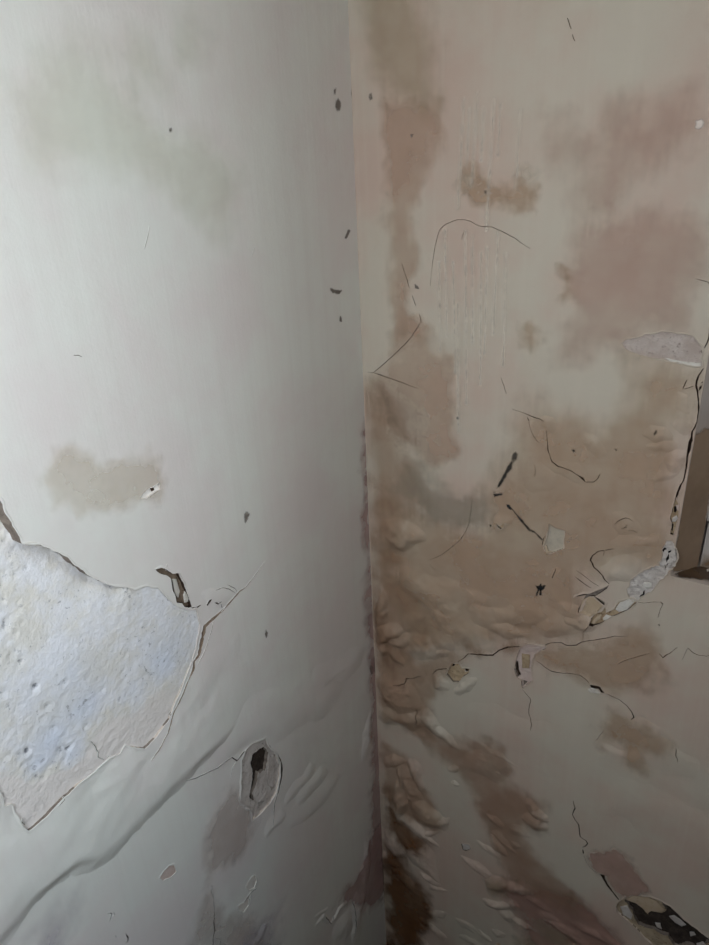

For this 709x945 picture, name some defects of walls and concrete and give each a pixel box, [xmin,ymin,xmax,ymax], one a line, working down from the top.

water stain [494,452,517,497]
water stain [674,428,709,571]
crack [552,517,638,588]
flaking render [572,497,680,627]
flaking render [0,496,201,834]
crack [393,626,709,720]
flaking render [239,737,281,822]
water stain [345,785,383,904]
water stain [501,886,621,945]
flaking render [589,850,709,945]